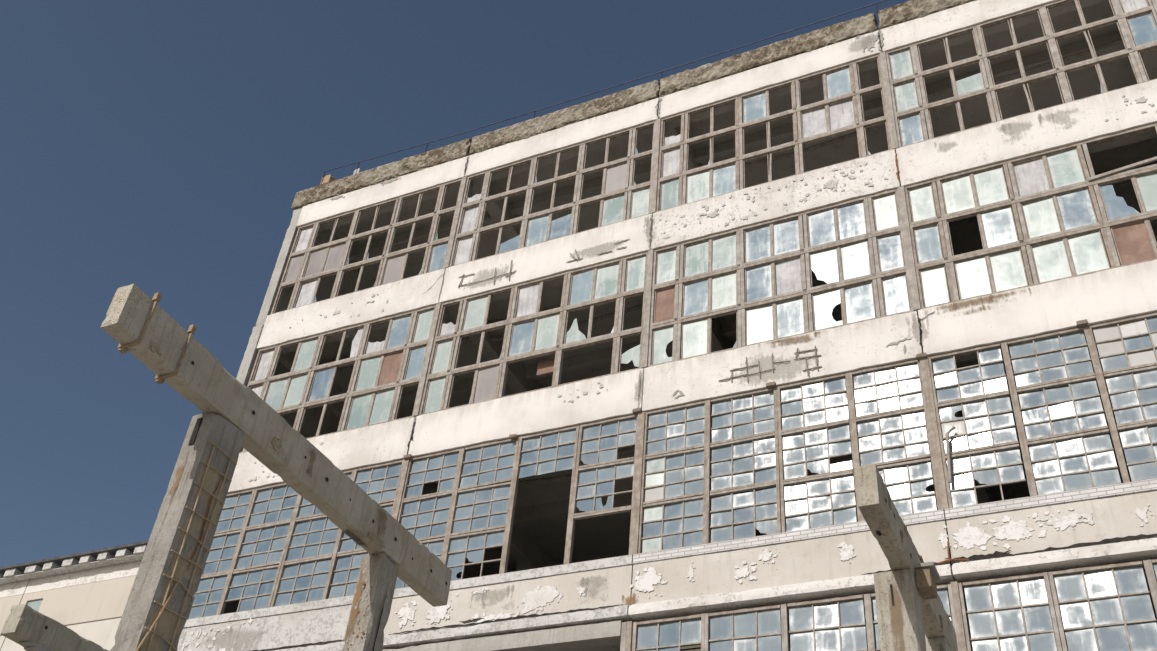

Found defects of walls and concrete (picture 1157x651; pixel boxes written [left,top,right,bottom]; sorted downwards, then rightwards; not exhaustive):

spalling [458,260,516,288]
spalling [718,346,822,382]
spalling [919,511,1157,565]
spalling [388,587,623,635]